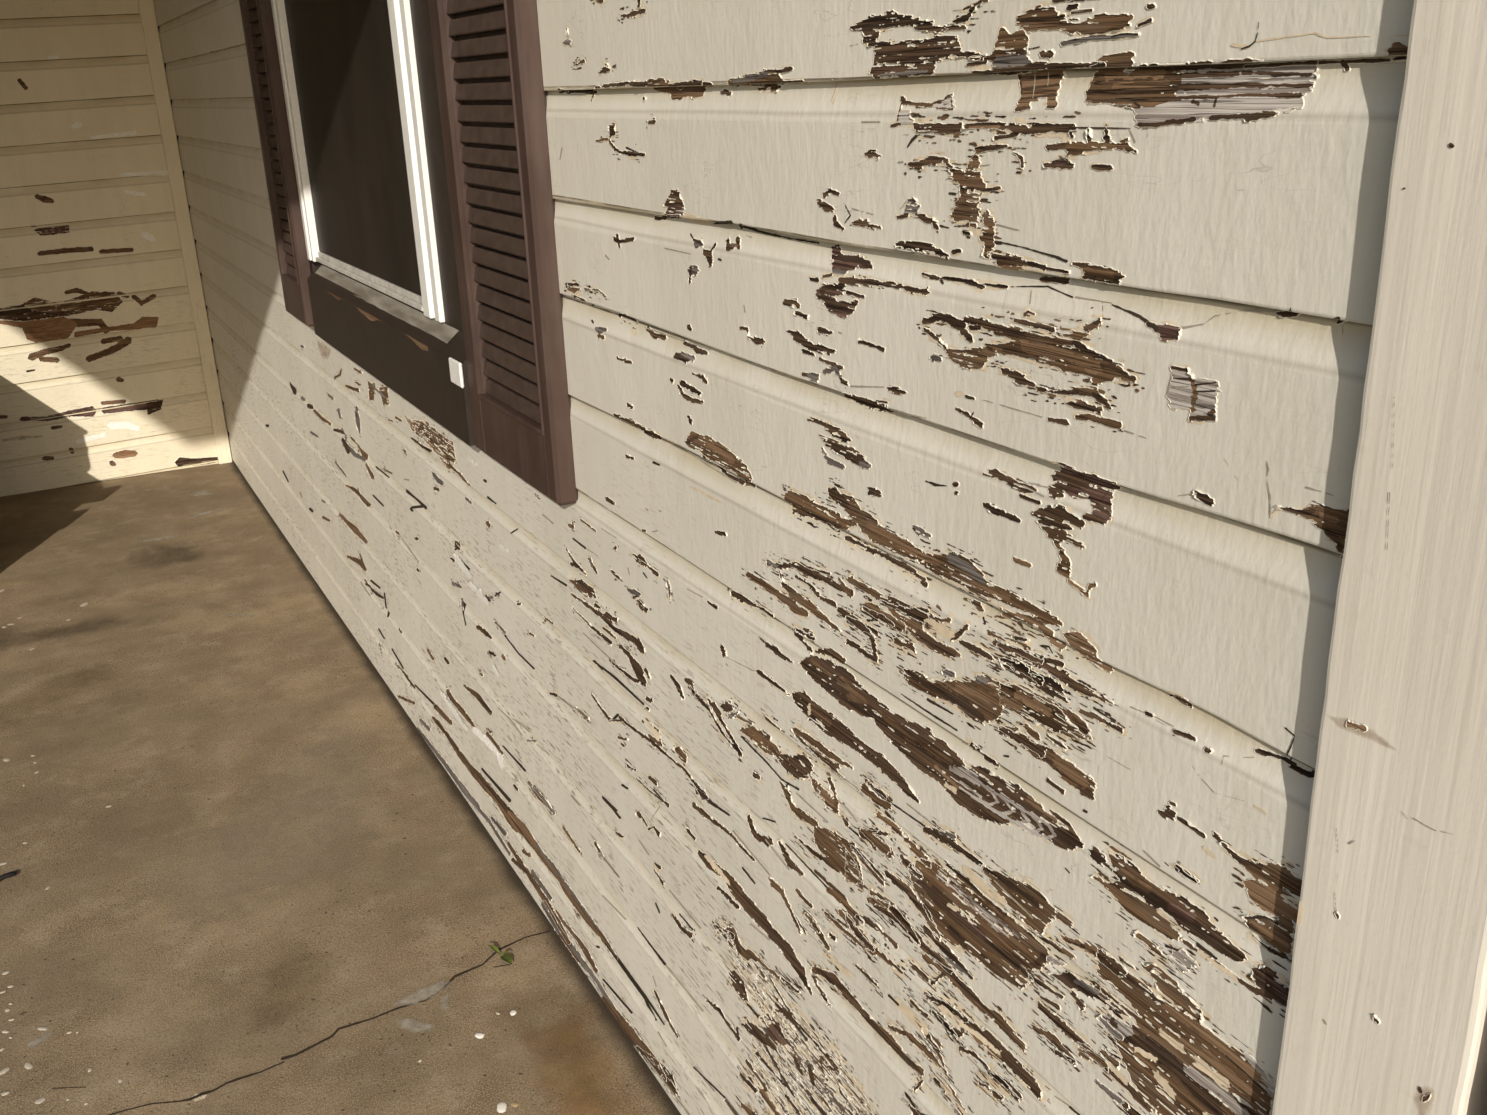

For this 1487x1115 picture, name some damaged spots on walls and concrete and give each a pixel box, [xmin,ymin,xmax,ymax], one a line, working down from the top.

peeling [595,120,647,160]
peeling [556,26,811,128]
peeling [0,287,160,372]
peeling [665,233,741,285]
peeling [782,0,1408,438]
peeling [0,376,164,467]
peeling [290,366,445,512]
peeling [646,323,757,488]
peeling [1270,486,1349,559]
peeling [282,456,680,1084]
peeling [535,416,1303,1115]
crack [109,930,550,1115]